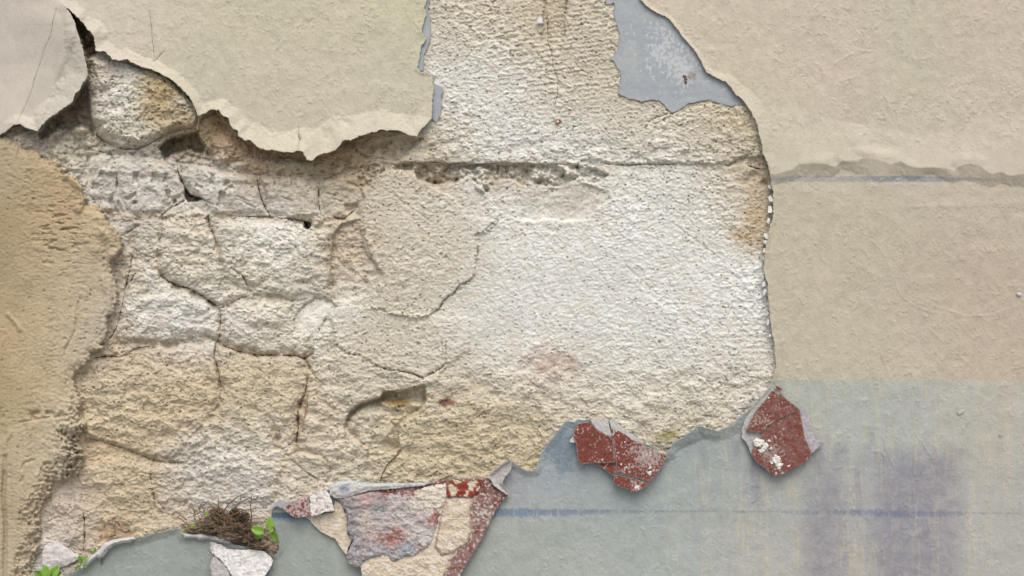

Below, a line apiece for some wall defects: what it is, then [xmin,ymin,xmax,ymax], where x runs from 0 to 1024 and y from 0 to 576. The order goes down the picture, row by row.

crack [93,165,354,480]
peeling [1,0,779,576]
crack [348,350,446,378]
crack [91,439,176,506]
peeling [570,385,824,494]